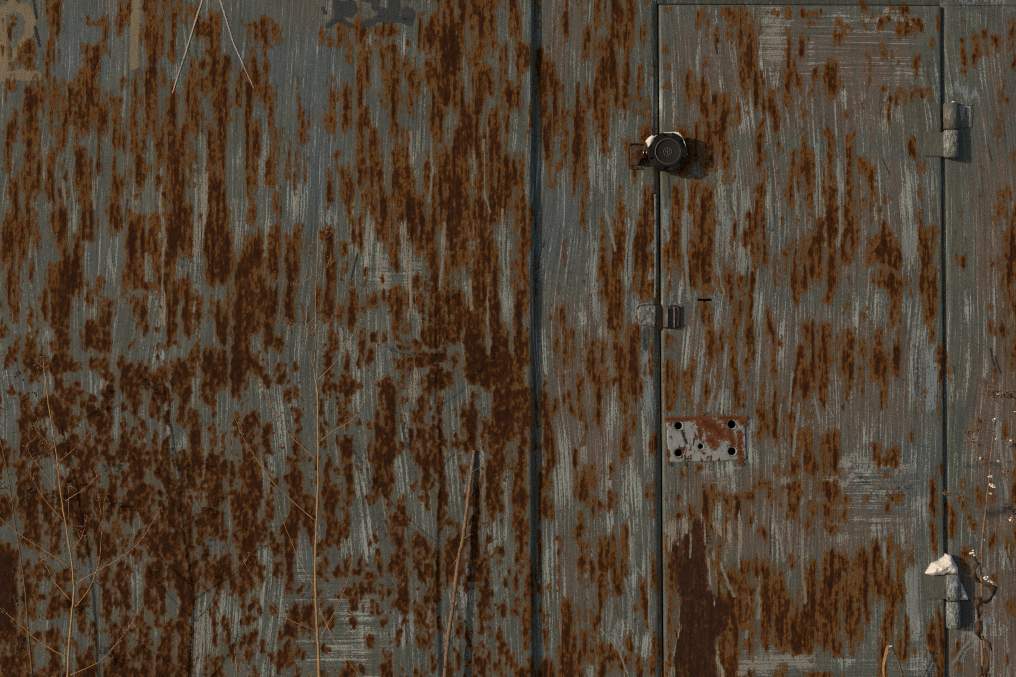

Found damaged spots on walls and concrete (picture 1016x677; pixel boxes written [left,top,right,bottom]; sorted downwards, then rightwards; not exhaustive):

corrosion [959,12,1016,104]
corrosion [954,230,967,272]
corrosion [0,0,661,677]
corrosion [658,0,955,677]
corrosion [978,183,1016,511]
corrosion [648,431,703,480]
corrosion [928,461,996,575]
corrosion [988,525,1016,583]
corrosion [925,602,962,677]